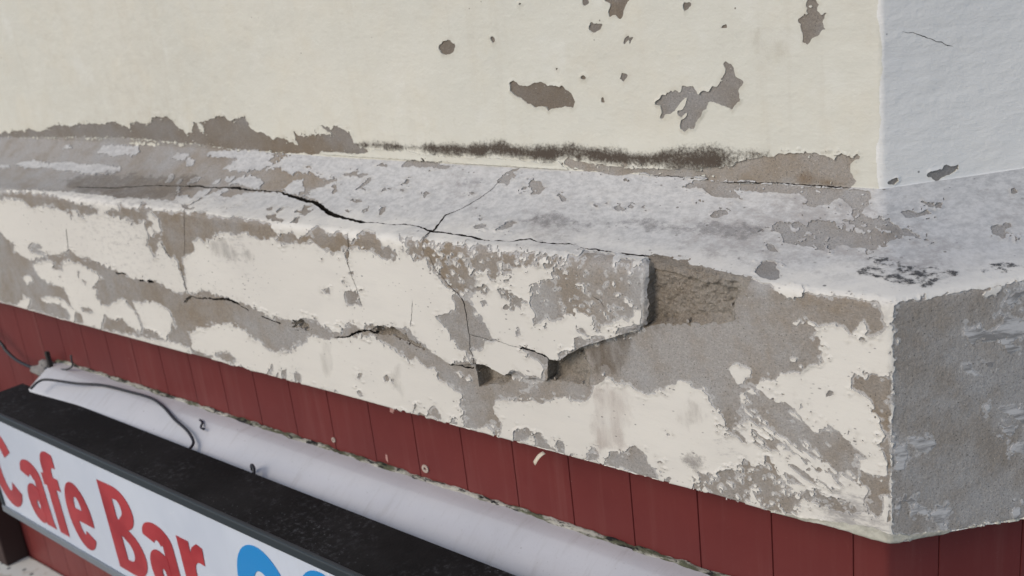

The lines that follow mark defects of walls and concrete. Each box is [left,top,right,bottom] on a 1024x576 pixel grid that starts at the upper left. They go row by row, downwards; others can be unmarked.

peeling [798,0,826,44]
peeling [439,40,455,55]
peeling [510,81,575,110]
peeling [656,61,743,131]
water stain [419,141,767,170]
crack [423,180,516,364]
peeling [0,116,1024,535]